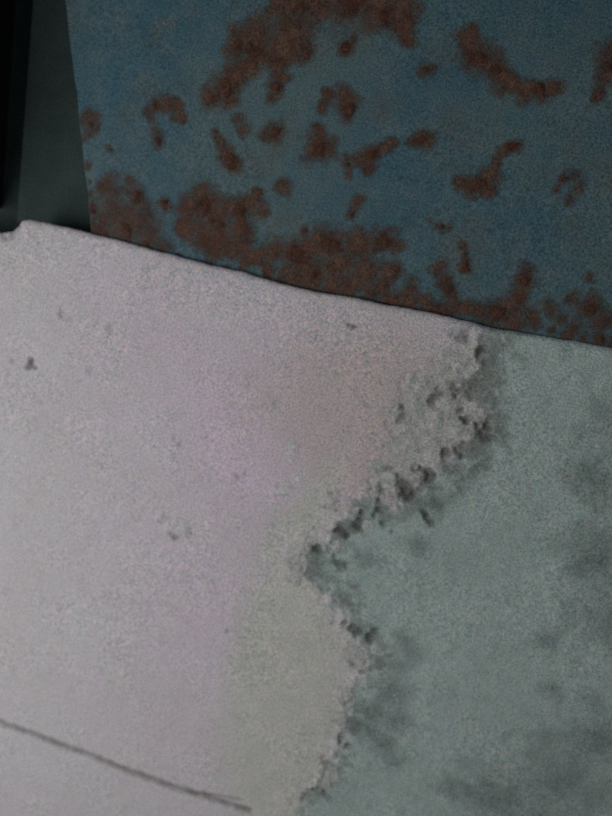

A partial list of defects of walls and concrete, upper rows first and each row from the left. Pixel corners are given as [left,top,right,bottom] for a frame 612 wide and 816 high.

rust [145,96,186,147]
rust [212,129,241,172]
rust [202,0,423,107]
rust [318,85,357,122]
rust [306,123,434,178]
rust [453,141,522,198]
rust [456,24,563,104]
rust [88,175,181,256]
rust [160,183,612,348]
flaking render [198,320,612,816]